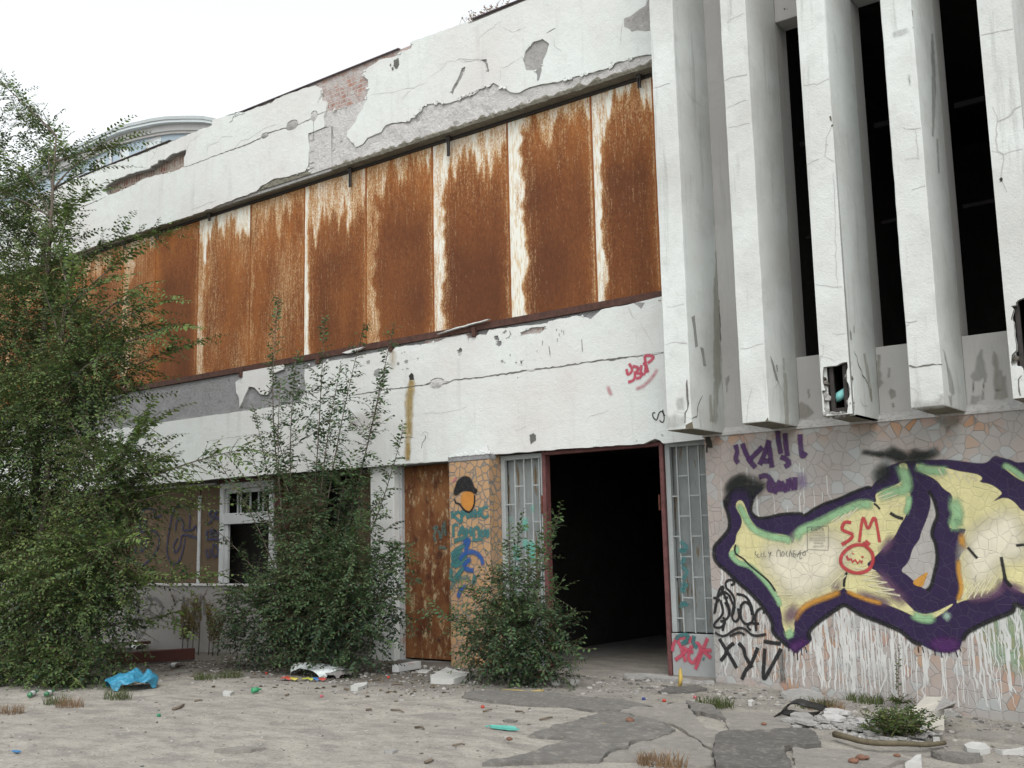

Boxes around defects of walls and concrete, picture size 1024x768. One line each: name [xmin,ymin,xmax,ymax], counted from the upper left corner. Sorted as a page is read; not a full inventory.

spalling [624,0,650,32]
crack [185,87,326,167]
spalling [317,40,652,173]
crack [992,106,1021,192]
corrosion [0,77,660,391]
spalling [72,347,388,435]
corrosion [405,381,414,460]
crack [355,307,687,395]
spalling [822,362,855,419]